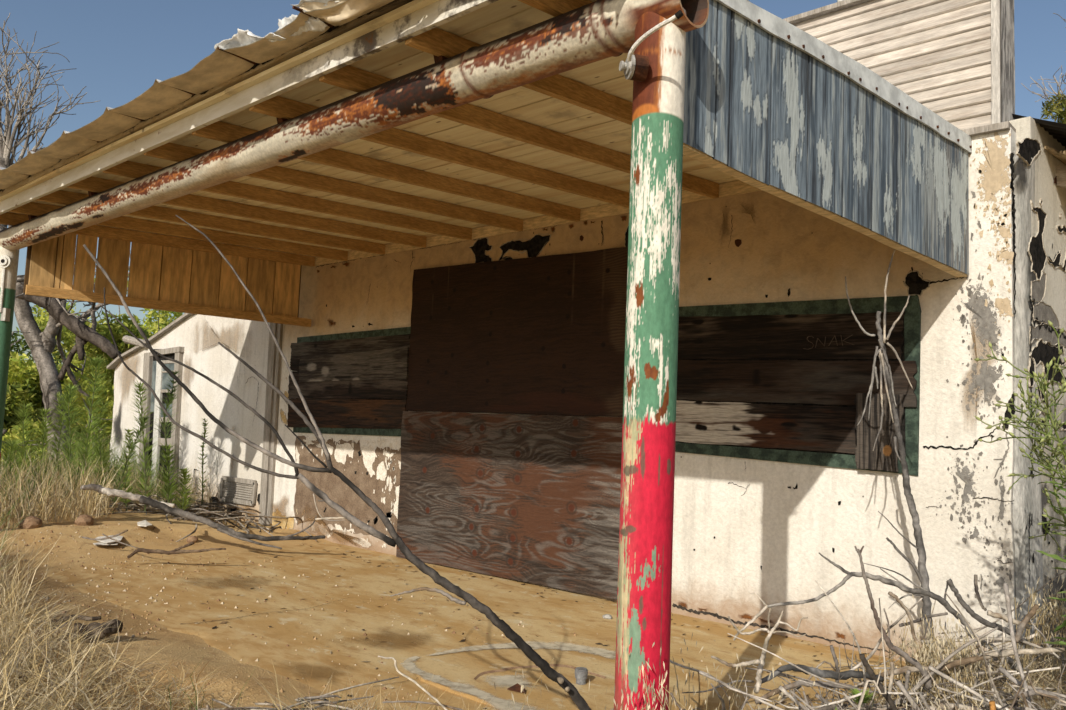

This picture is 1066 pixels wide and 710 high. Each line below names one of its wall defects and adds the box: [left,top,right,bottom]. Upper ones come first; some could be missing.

peeling [268,434,401,548]
spalling [469,232,551,263]
crack [923,153,1066,585]
peeling [946,132,1066,431]